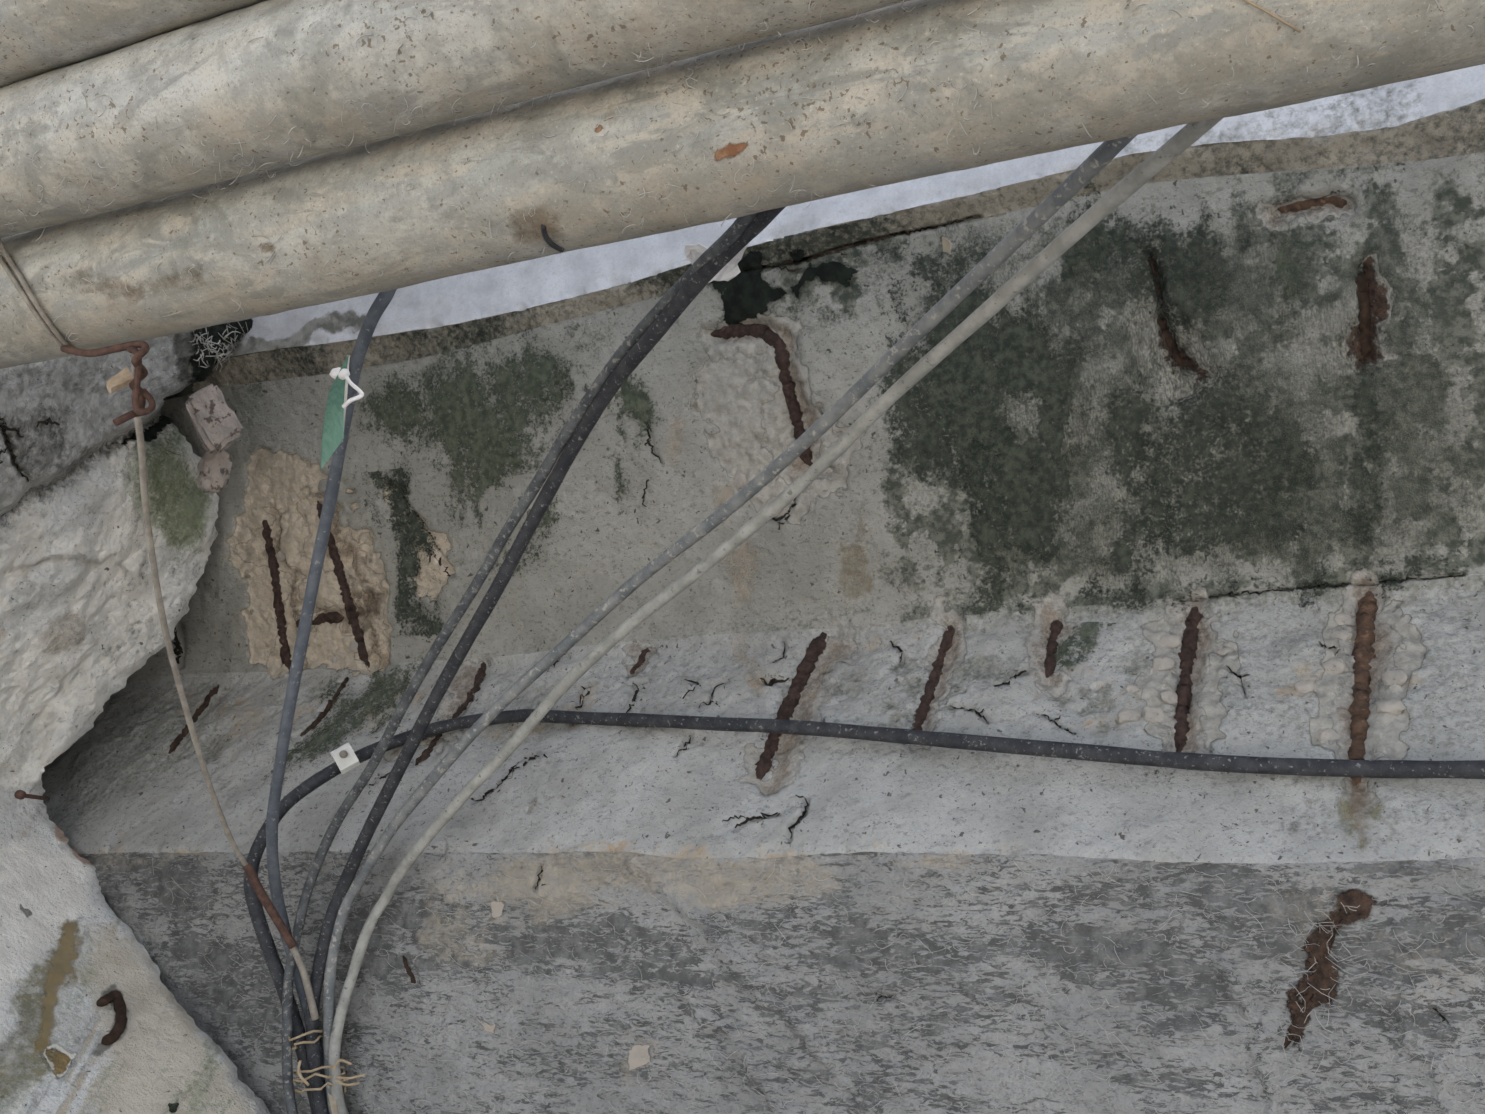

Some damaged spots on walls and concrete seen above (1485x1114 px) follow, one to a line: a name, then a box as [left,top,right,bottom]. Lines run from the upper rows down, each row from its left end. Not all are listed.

crack [0,413,60,482]
spalling [691,346,865,525]
spalling [226,448,392,676]
rust [737,609,858,795]
spalling [1117,618,1241,753]
rust [1158,583,1225,754]
spalling [1295,606,1356,759]
rust [1329,568,1405,847]
spalling [1363,600,1427,760]
crack [722,794,809,839]
rust [94,984,128,1055]
rust [1284,889,1377,1051]